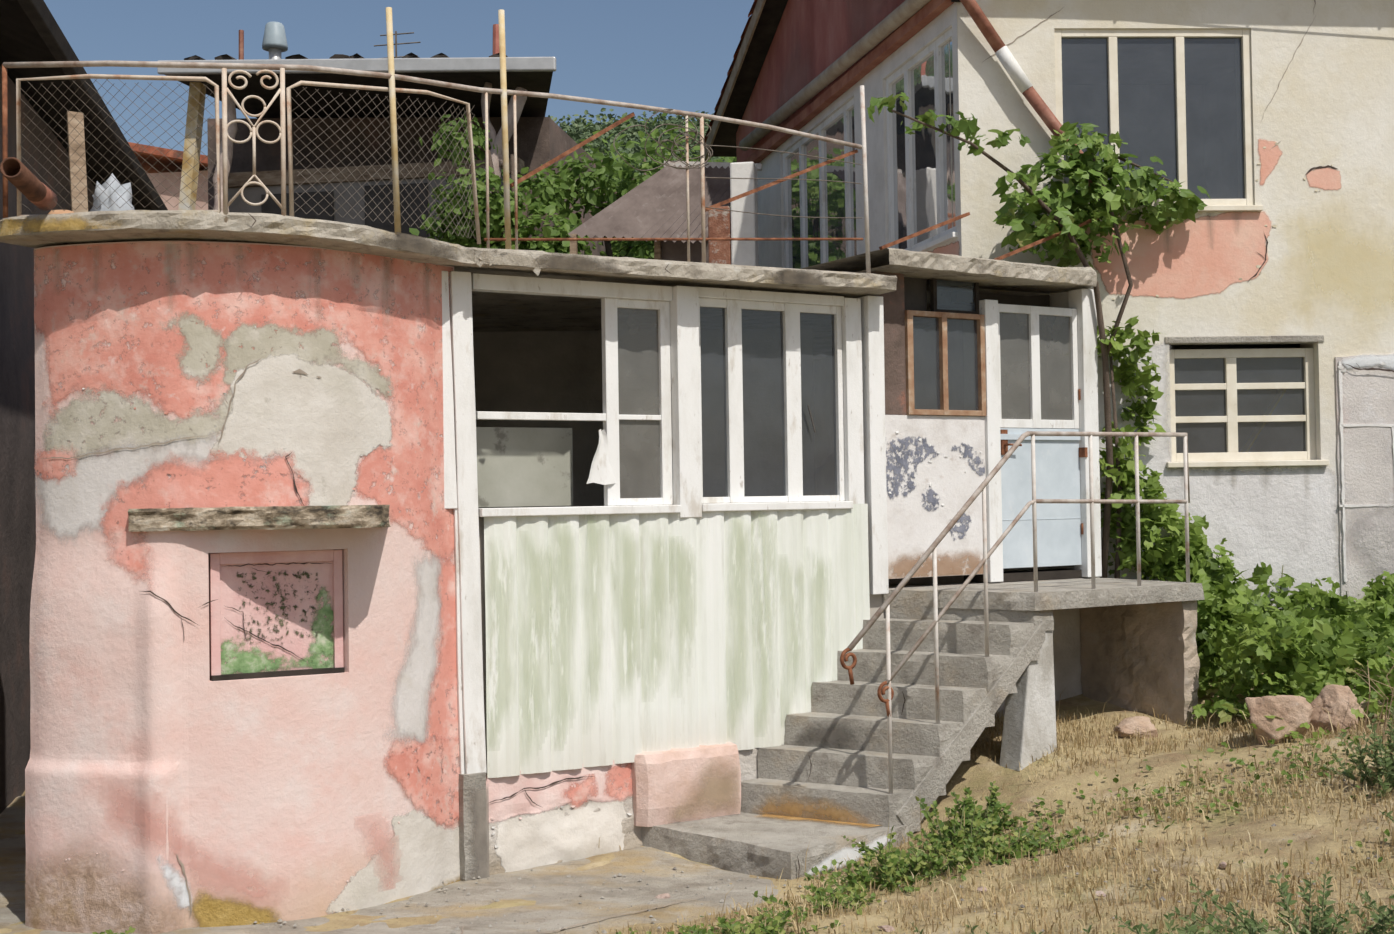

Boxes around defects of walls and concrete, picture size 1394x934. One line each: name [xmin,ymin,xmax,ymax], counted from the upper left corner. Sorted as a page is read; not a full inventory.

crack [1261,0,1316,150]
peeling [1256,139,1282,185]
crack [1305,165,1337,175]
spalling [1303,164,1341,192]
peeling [1085,211,1277,300]
peeling [886,431,985,540]
peeling [34,242,460,913]
crack [228,562,332,572]
crack [142,591,304,660]
spalling [486,760,633,872]